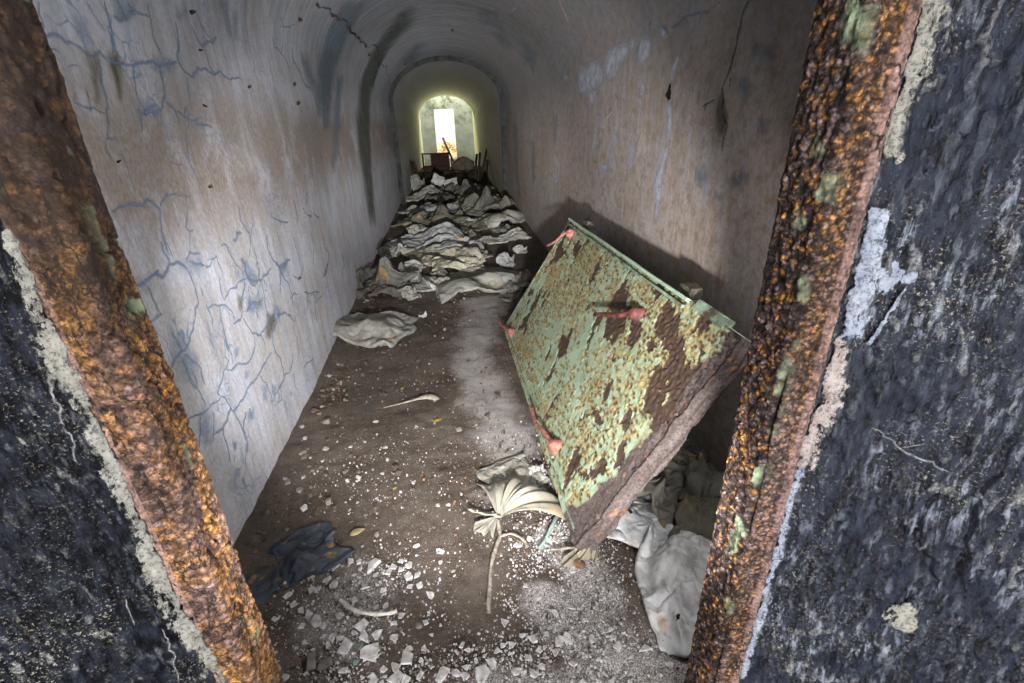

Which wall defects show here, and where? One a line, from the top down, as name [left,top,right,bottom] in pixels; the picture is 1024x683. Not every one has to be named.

leakage [303,4,362,164]
crack [318,6,390,85]
leakage [358,14,409,217]
crack [660,1,749,146]
crack [38,2,344,476]
flaking render [740,207,919,679]